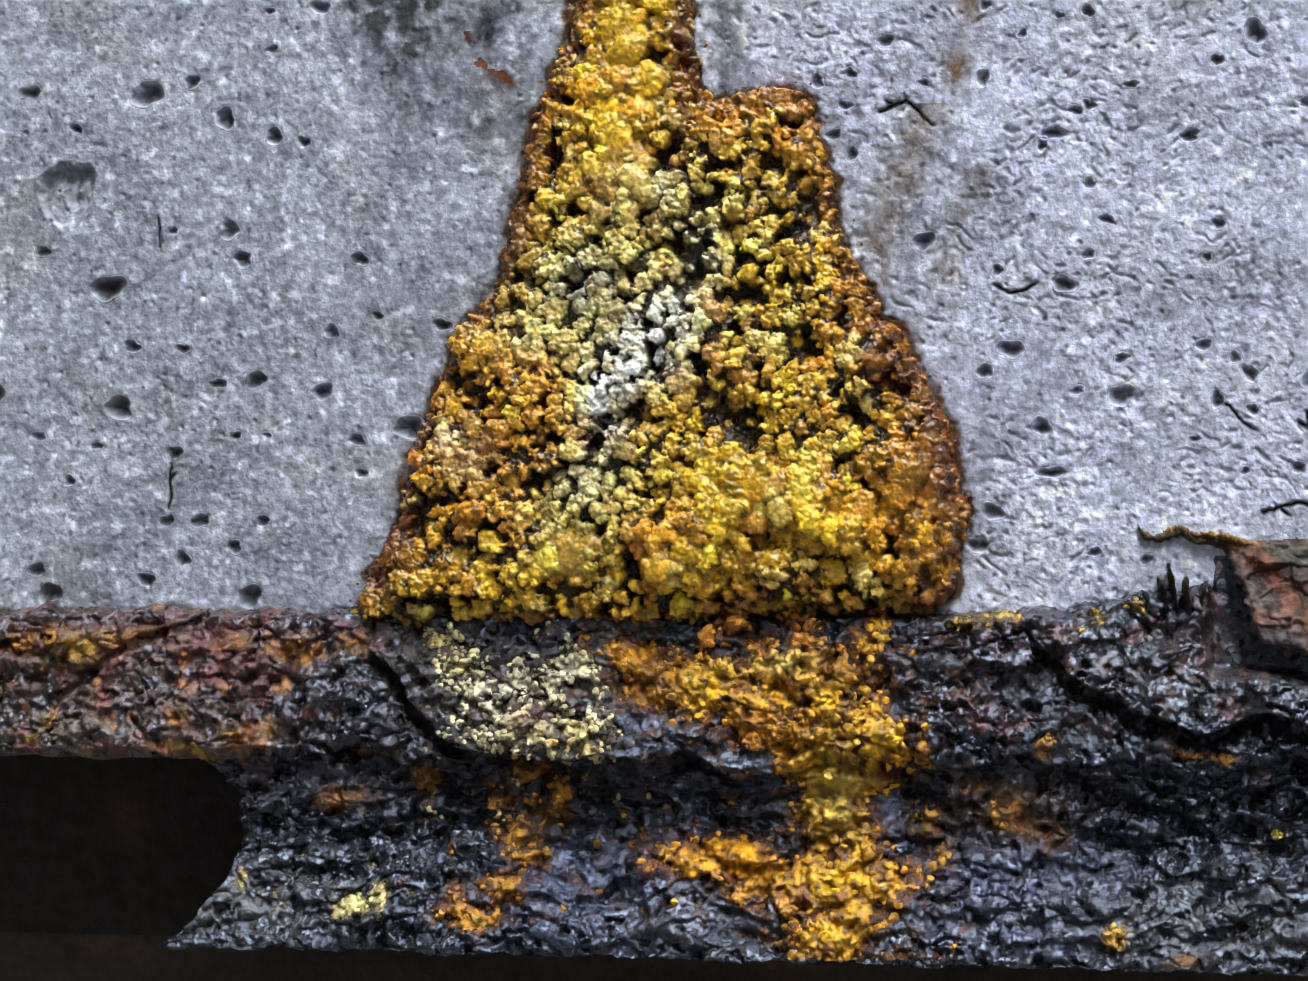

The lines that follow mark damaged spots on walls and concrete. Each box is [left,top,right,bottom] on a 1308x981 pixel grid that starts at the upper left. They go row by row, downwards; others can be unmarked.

rust [463,0,519,87]
rust [950,53,964,78]
crack [1217,397,1255,430]
rust [11,625,169,661]
rust [276,637,322,663]
rust [162,707,188,727]
rust [176,743,209,762]
rust [862,952,925,961]
rust [1171,954,1201,967]